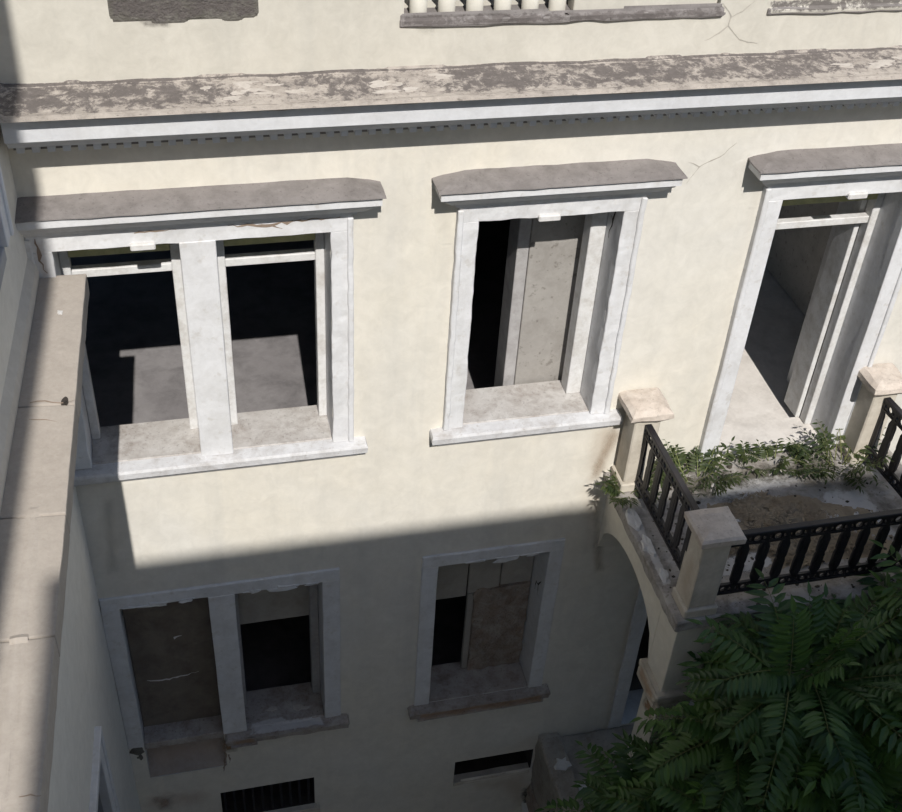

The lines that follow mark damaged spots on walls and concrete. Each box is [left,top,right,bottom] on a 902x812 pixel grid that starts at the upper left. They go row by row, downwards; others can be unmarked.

crack [707,1,755,43]
peeling [867,55,902,68]
peeling [223,81,307,101]
peeling [369,80,418,94]
peeling [228,217,340,229]